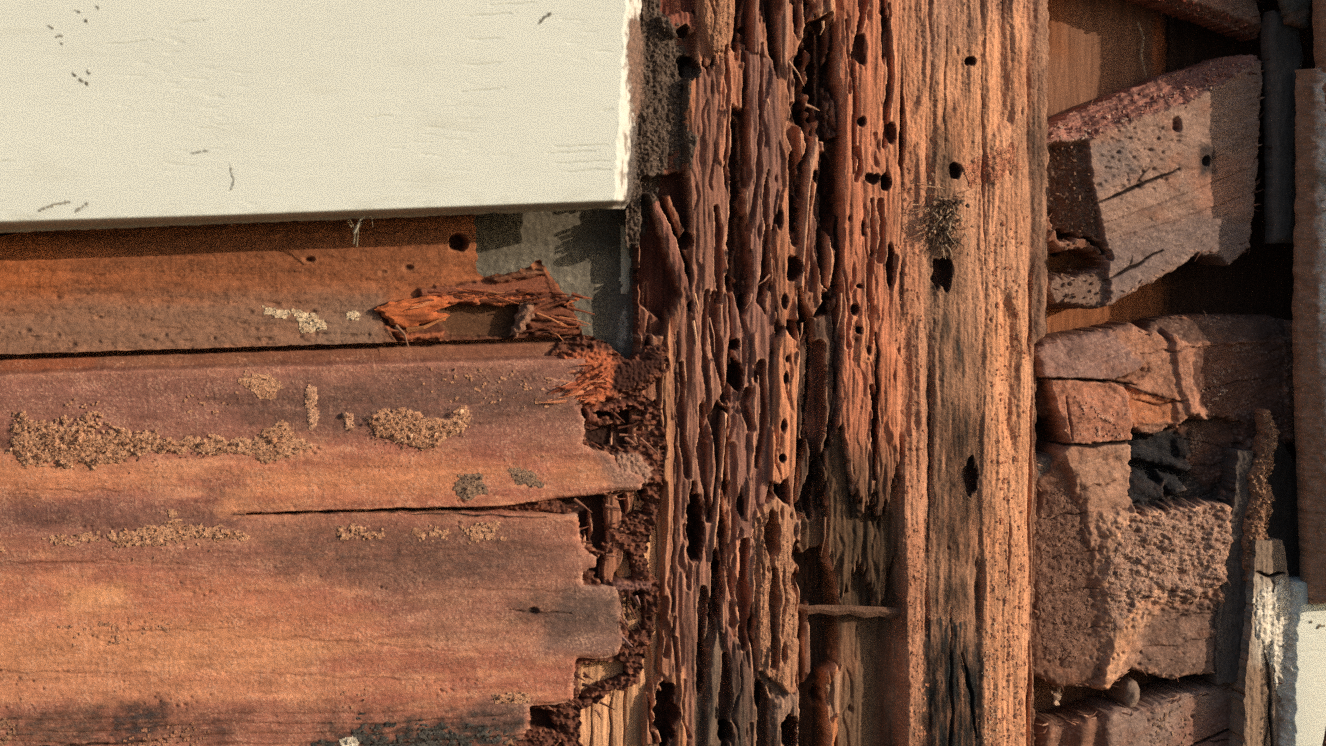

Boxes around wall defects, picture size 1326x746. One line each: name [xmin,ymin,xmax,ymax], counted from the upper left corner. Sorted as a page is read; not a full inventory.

peeling [619,225,631,294]
peeling [346,295,450,328]
peeling [509,468,544,488]
crack [232,506,546,518]
damp [311,711,523,746]